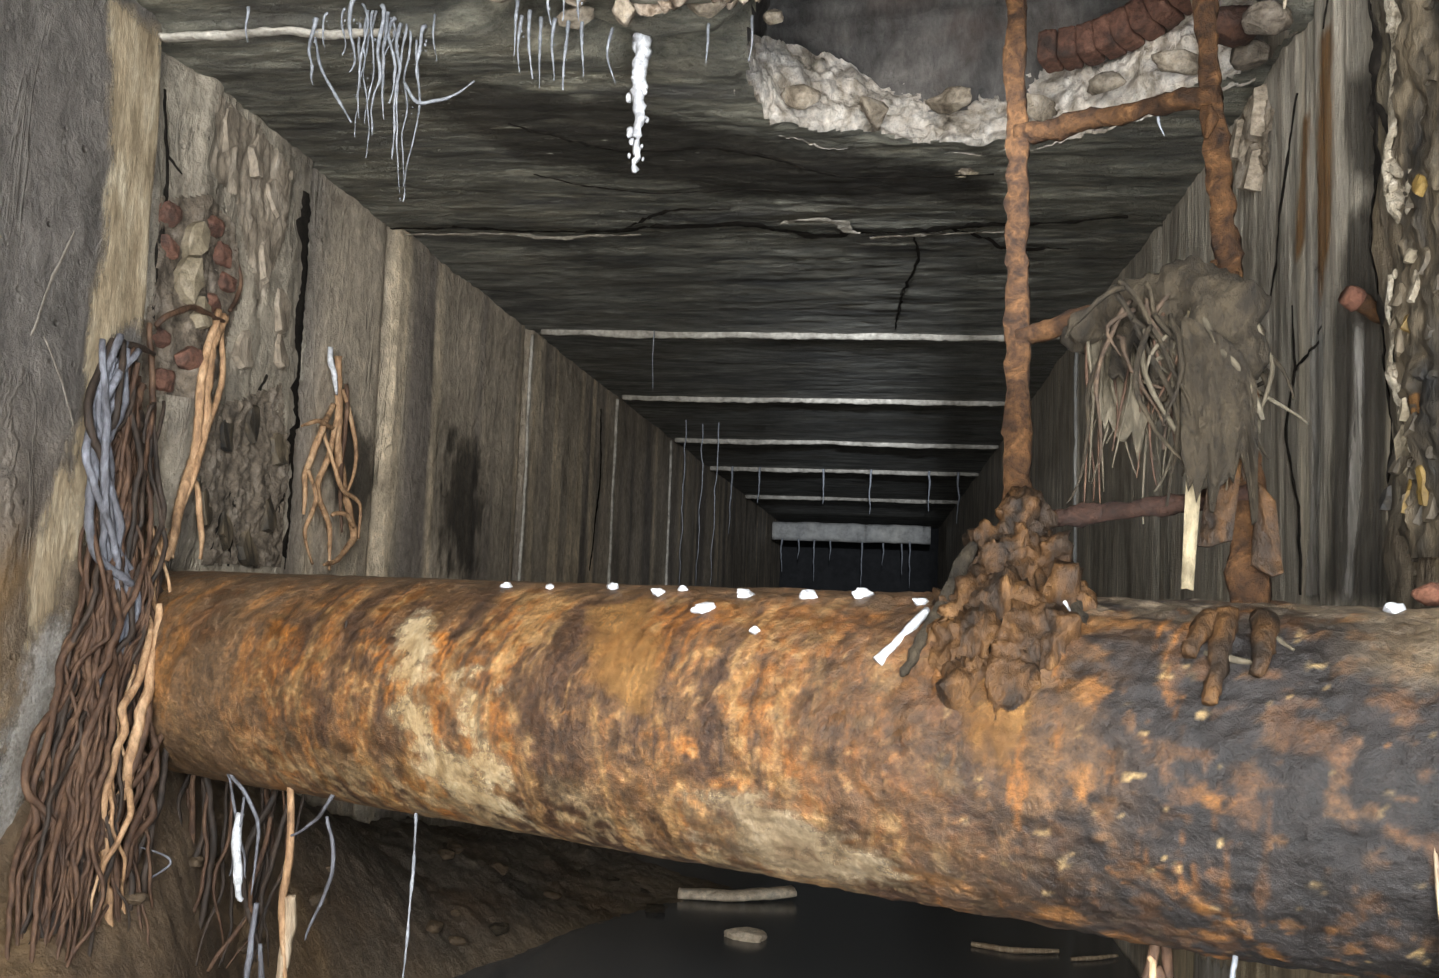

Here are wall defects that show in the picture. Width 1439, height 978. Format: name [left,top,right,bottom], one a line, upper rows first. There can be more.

spalling [556,0,595,30]
damp [435,83,999,203]
spalling [612,0,1007,178]
spalling [1031,126,1116,151]
spalling [1026,13,1199,122]
spalling [1218,44,1275,192]
crack [390,123,1128,330]
corrosion [593,599,658,712]
corrosion [976,678,1025,744]